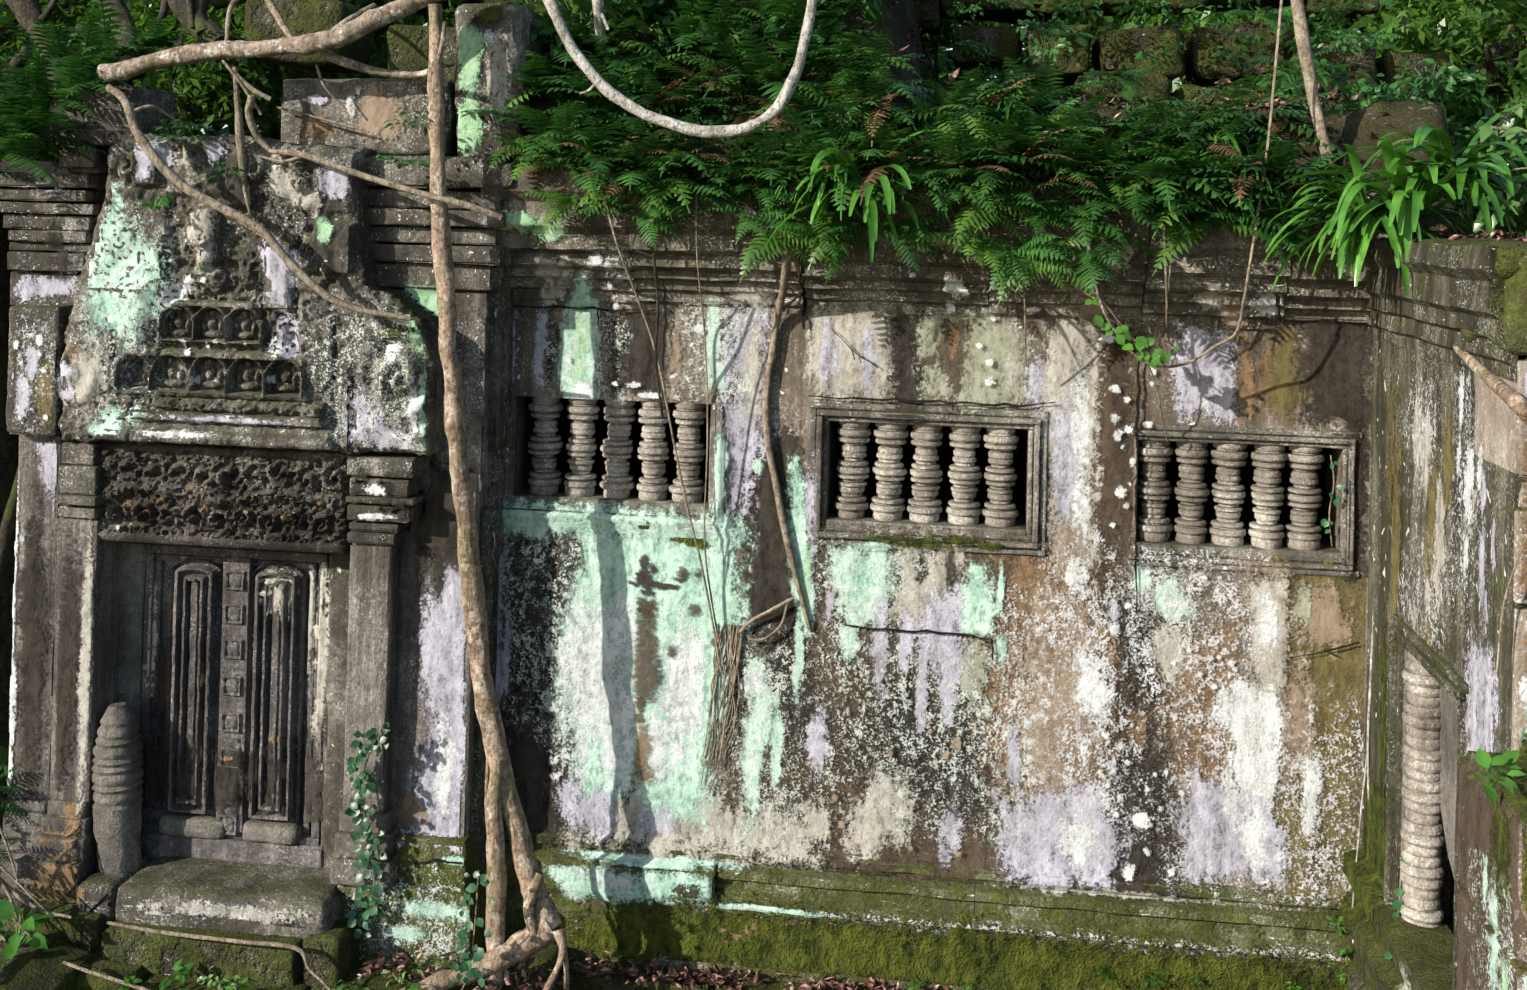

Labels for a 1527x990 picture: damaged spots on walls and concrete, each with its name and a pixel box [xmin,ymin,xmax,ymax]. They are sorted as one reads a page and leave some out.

crack [844,624,994,660]
leakage [495,285,1527,990]